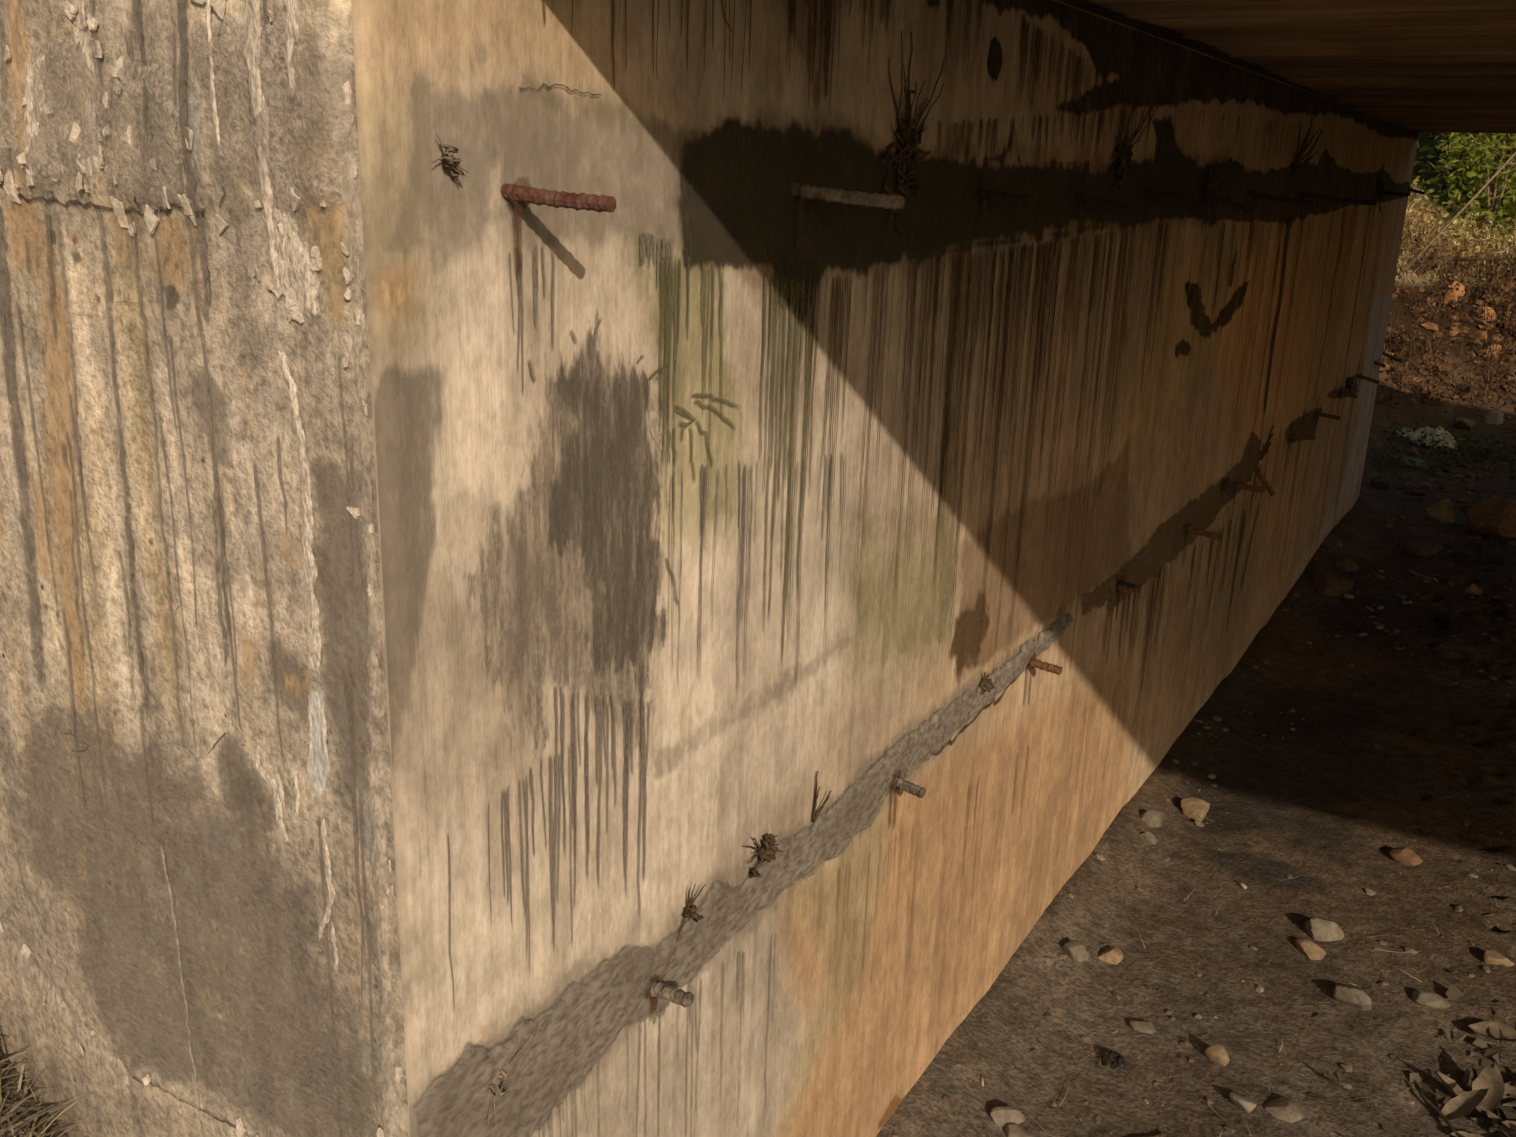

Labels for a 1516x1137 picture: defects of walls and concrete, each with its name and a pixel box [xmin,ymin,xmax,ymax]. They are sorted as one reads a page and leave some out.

crack [0,167,228,236]
water stain [243,0,299,288]
water stain [470,0,1420,974]
water stain [0,209,441,1137]
corrosion [890,770,902,828]
water stain [447,836,455,1009]
corrosion [645,977,661,1024]
crack [100,1058,259,1137]